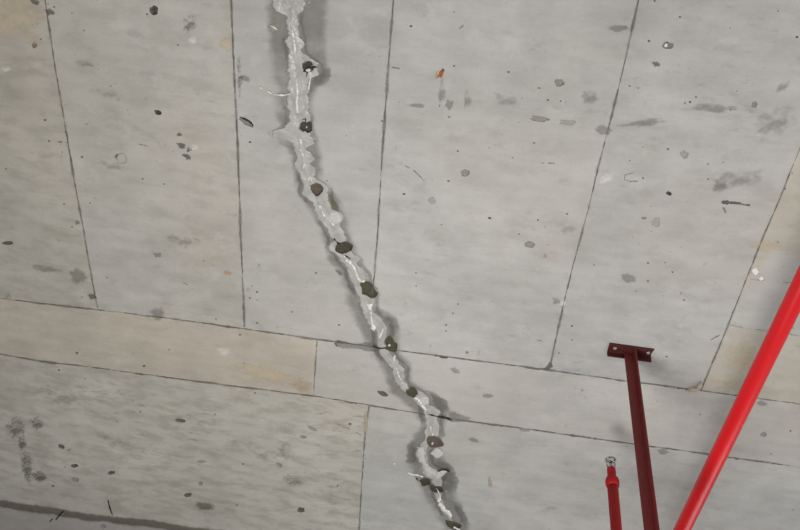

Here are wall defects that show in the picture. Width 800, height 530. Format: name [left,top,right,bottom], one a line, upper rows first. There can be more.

crack [260,0,460,530]